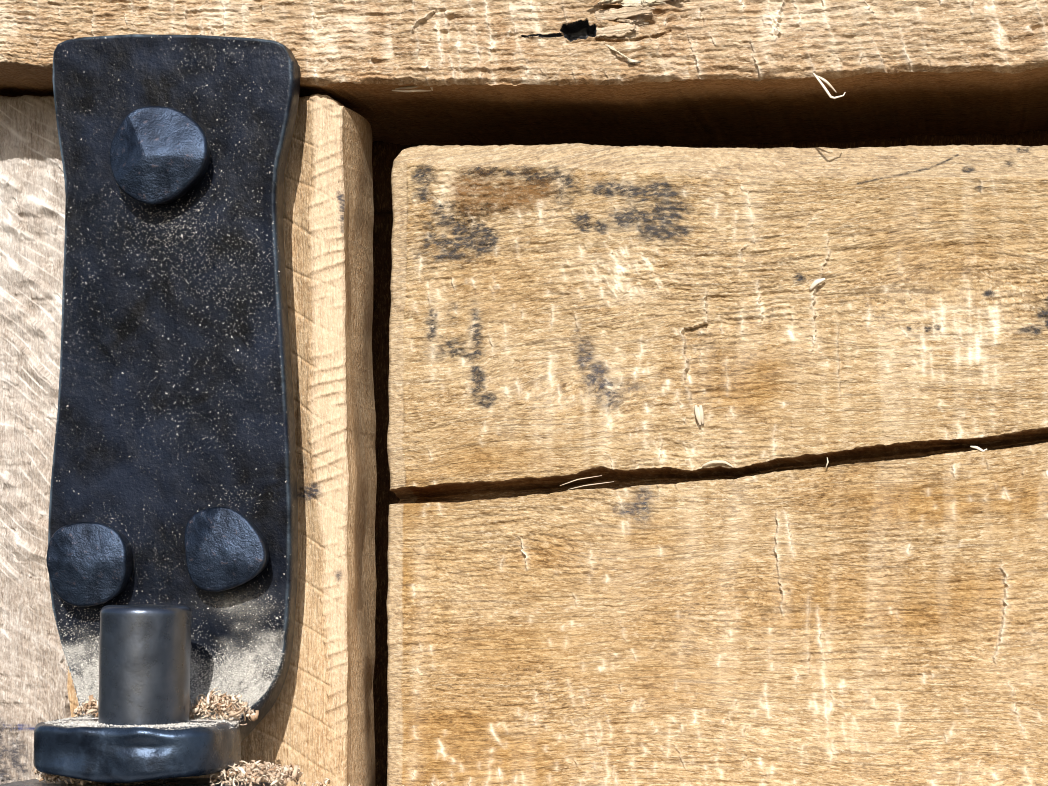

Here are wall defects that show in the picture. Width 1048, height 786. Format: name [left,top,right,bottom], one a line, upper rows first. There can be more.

spalling [591,0,668,27]
leakage [412,166,577,261]
leakage [572,182,688,242]
crack [390,428,1048,504]